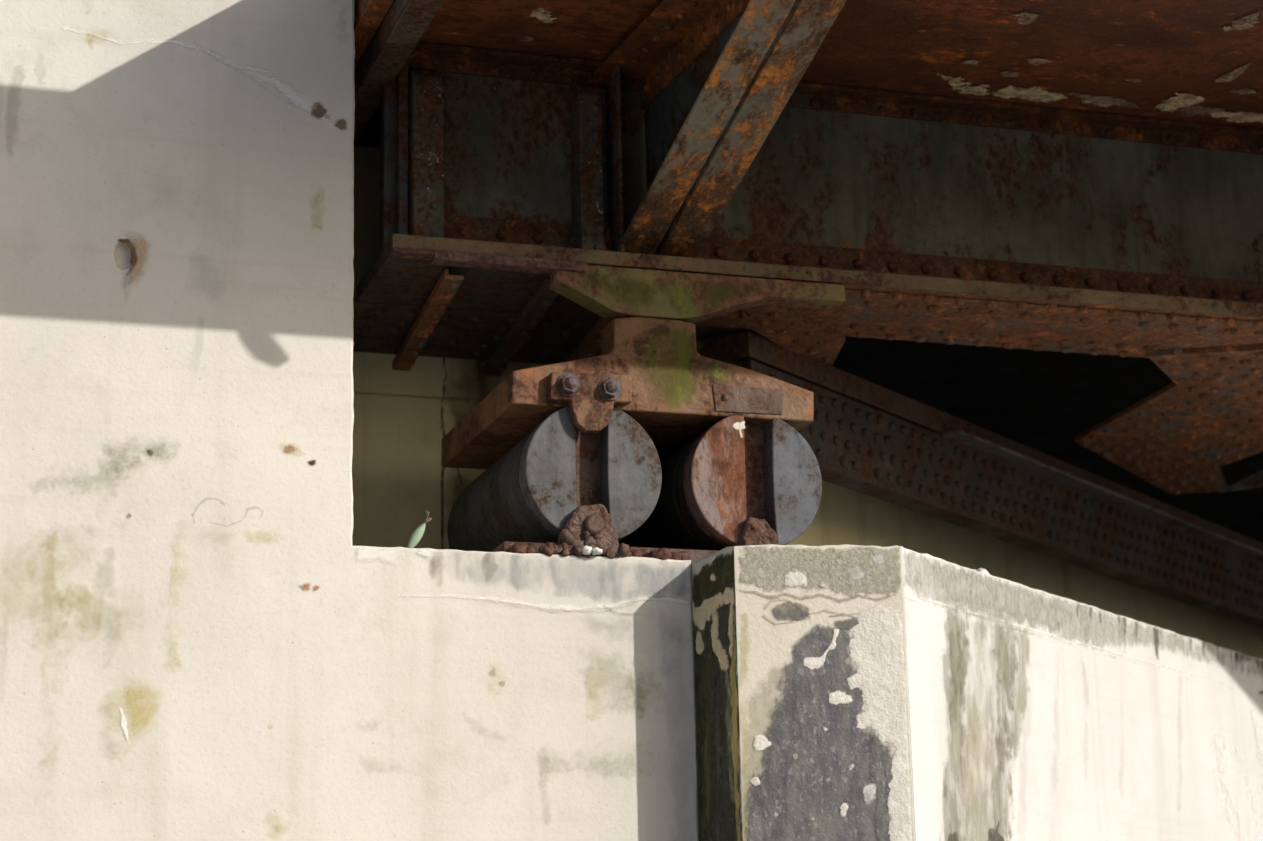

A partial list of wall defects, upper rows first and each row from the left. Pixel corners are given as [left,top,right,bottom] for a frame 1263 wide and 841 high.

peeling [1222,13,1260,31]
crack [62,27,330,121]
peeling [937,60,1136,108]
peeling [1215,64,1256,95]
peeling [1154,92,1263,123]
spalling [114,239,146,277]
corrosion [542,526,629,559]
damp [692,546,1261,841]
damp [120,698,147,740]
peeling [742,590,913,841]